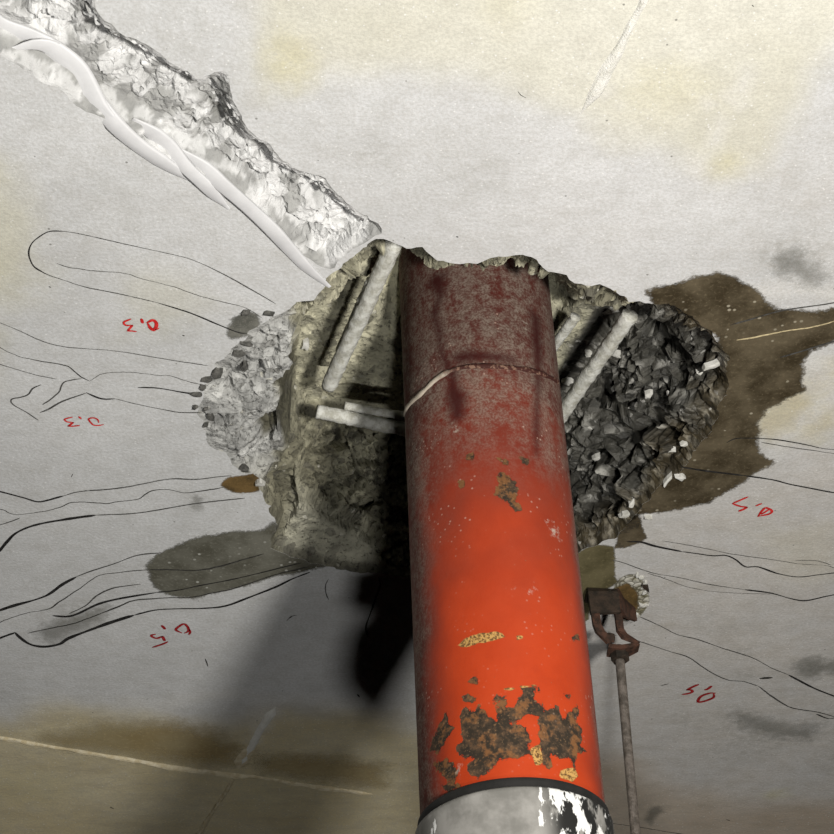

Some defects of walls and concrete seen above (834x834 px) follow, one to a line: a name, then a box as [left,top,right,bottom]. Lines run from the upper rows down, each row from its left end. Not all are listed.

spalling [0,0,730,577]
corrosion [221,474,259,493]
water stain [578,273,834,621]
water stain [146,522,326,599]
water stain [62,726,231,762]